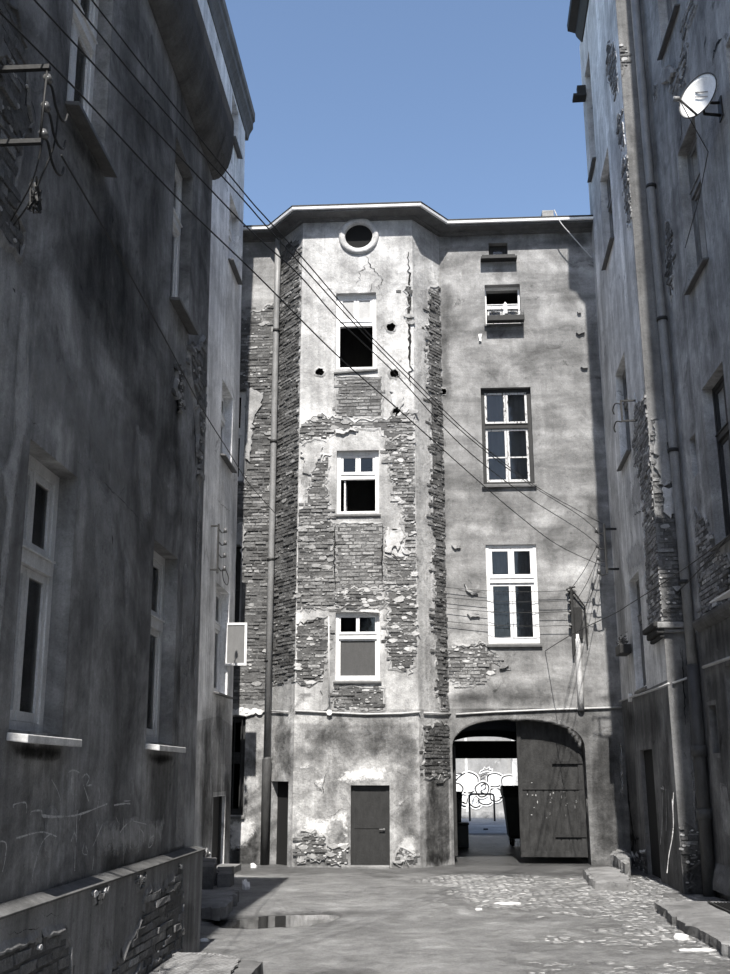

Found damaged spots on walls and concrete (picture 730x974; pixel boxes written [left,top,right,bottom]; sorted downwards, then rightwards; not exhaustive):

flaking render [668,0,698,96]
flaking render [0,0,34,265]
flaking render [605,39,632,231]
crack [406,252,414,385]
flaking render [171,335,208,484]
flaking render [233,235,511,783]
flaking render [632,391,684,626]
flaking render [694,507,730,618]
flaking render [0,923,75,974]
flaking render [102,862,186,974]
flaking render [292,828,349,867]
flaking render [393,845,420,868]